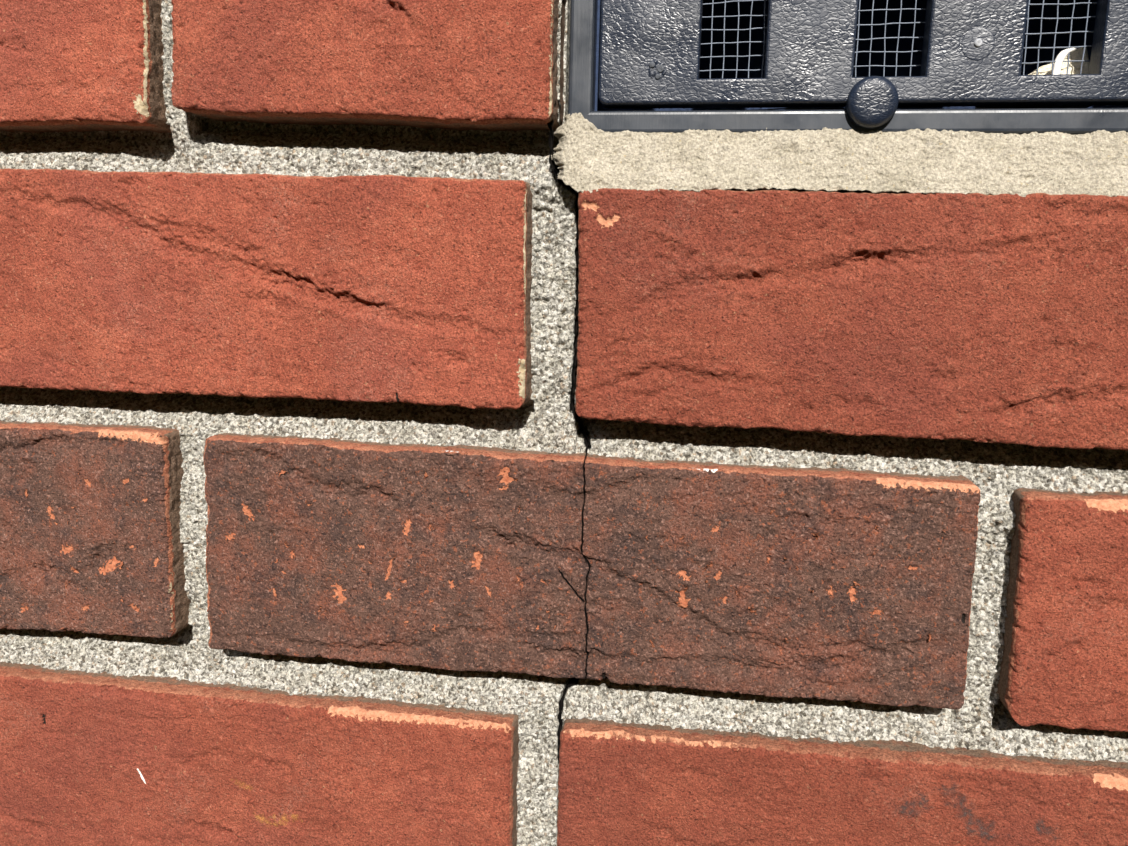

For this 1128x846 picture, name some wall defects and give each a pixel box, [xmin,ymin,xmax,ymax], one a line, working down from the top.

crack [547,101,591,799]